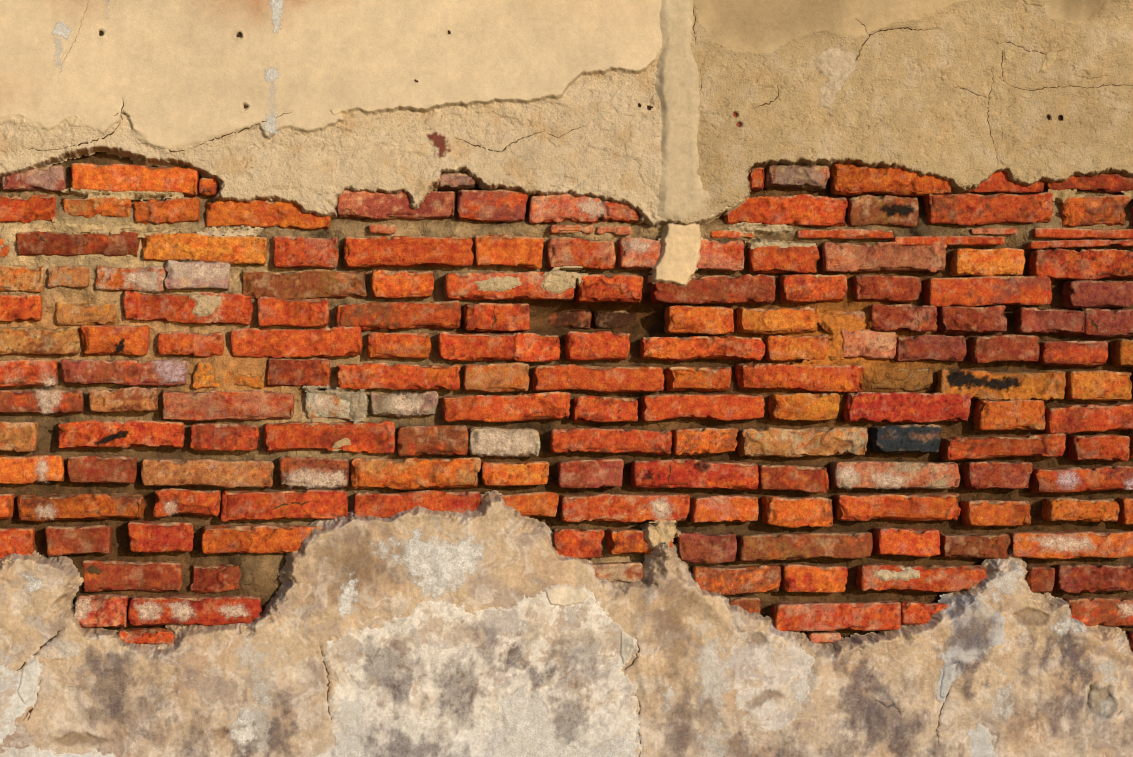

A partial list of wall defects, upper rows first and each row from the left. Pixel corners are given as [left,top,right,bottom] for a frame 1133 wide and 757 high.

crack [855,19,929,61]
flaking render [0,0,1133,228]
crack [954,42,1133,157]
peeling [0,654,116,757]
leakage [136,601,196,620]
leakage [229,675,298,757]
efflorescence [371,529,485,598]
peeling [315,584,643,757]
leakage [489,668,639,757]
peeling [729,623,815,732]
peeling [934,592,1006,703]
leakage [1040,536,1095,552]